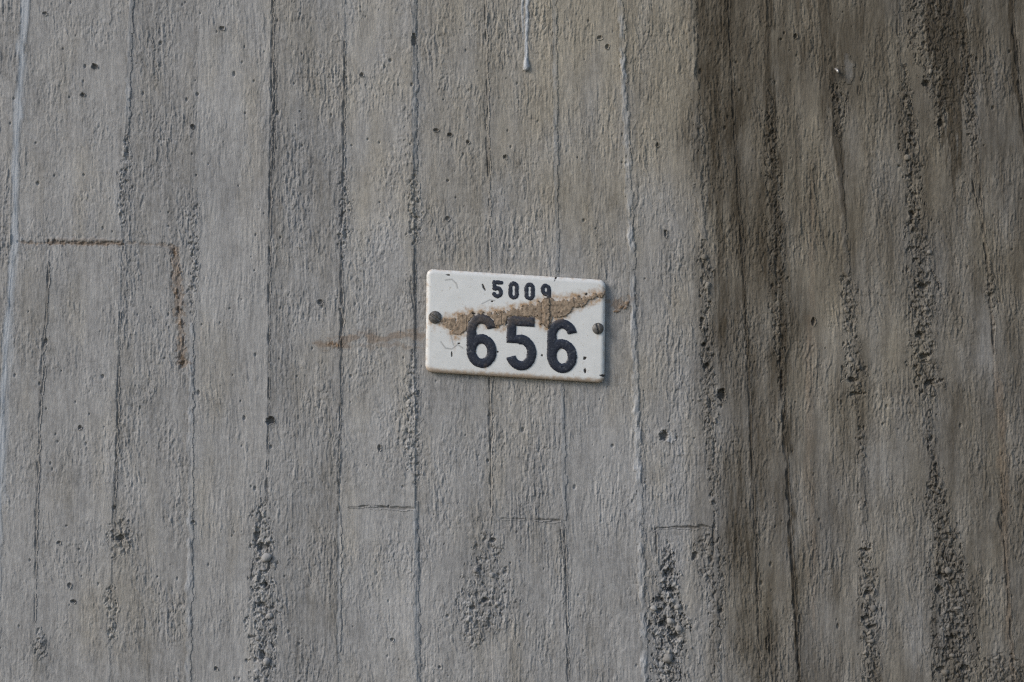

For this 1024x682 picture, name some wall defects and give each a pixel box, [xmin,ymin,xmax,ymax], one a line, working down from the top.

water stain [662,0,1024,682]